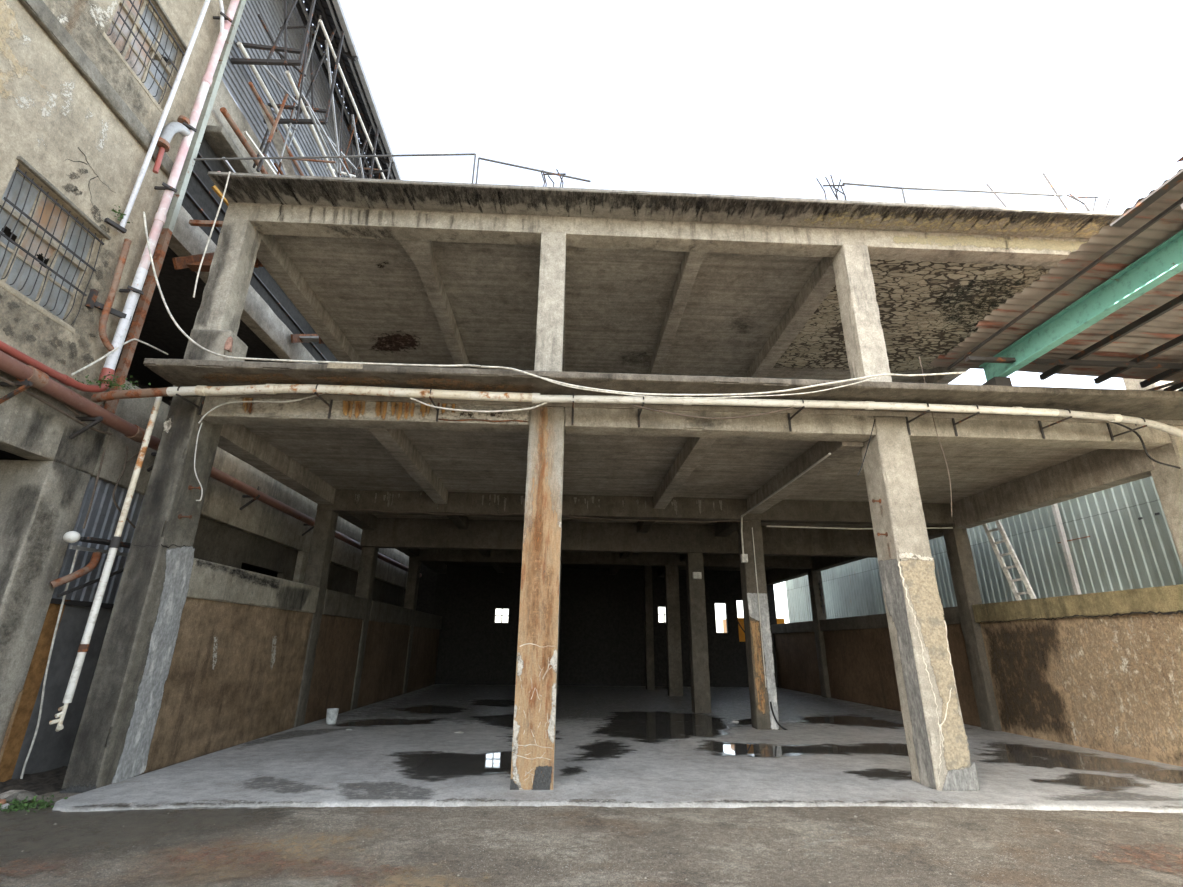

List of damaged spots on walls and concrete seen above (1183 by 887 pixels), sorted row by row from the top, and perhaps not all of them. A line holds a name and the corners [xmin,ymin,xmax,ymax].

peeling [0,0,29,78]
leakage [212,175,1116,252]
leakage [924,275,1037,332]
rust [343,401,455,420]
rust [511,406,561,790]
rust [750,621,765,714]
leakage [985,622,1076,742]